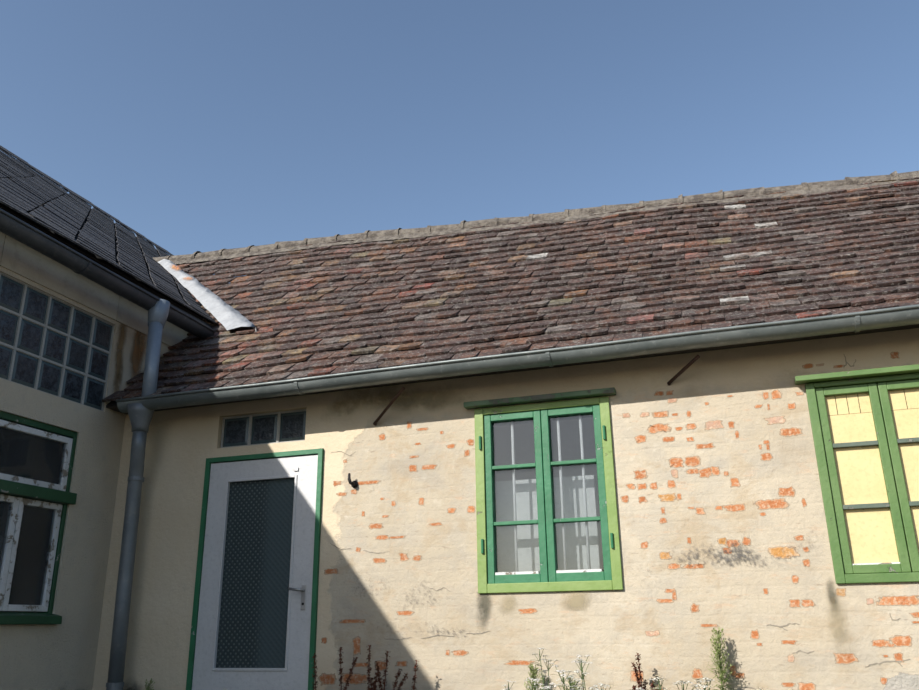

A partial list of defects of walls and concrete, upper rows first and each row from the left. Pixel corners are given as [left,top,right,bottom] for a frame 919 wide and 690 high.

spalling [621,390,807,524]
spalling [333,480,379,496]
spalling [362,498,404,540]
spalling [659,552,704,569]
leakage [679,544,766,565]
spalling [717,537,751,554]
spalling [768,535,810,567]
spalling [789,599,815,607]
spalling [866,595,919,623]
spalling [833,653,859,664]
spalling [872,635,912,662]
spalling [781,682,816,690]